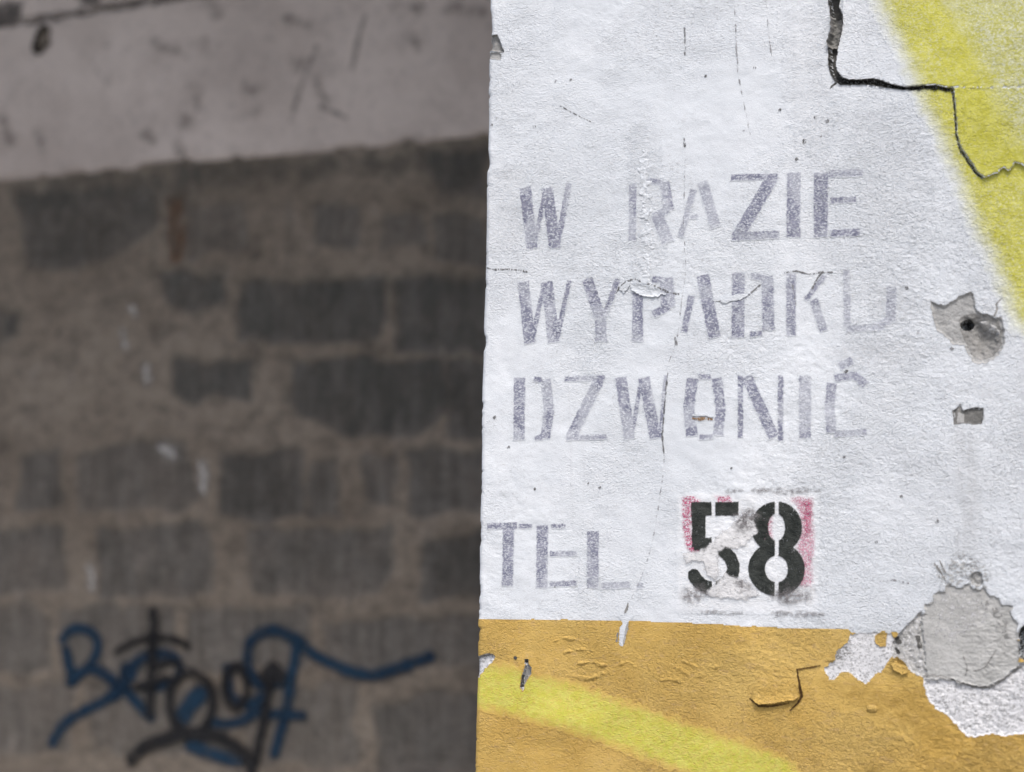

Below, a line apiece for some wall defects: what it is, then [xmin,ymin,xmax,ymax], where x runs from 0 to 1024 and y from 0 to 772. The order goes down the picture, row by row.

crack [826,0,1014,179]
peeling [624,122,667,302]
flaking render [931,292,1005,364]
spalling [952,404,984,425]
flaking render [824,554,1024,737]